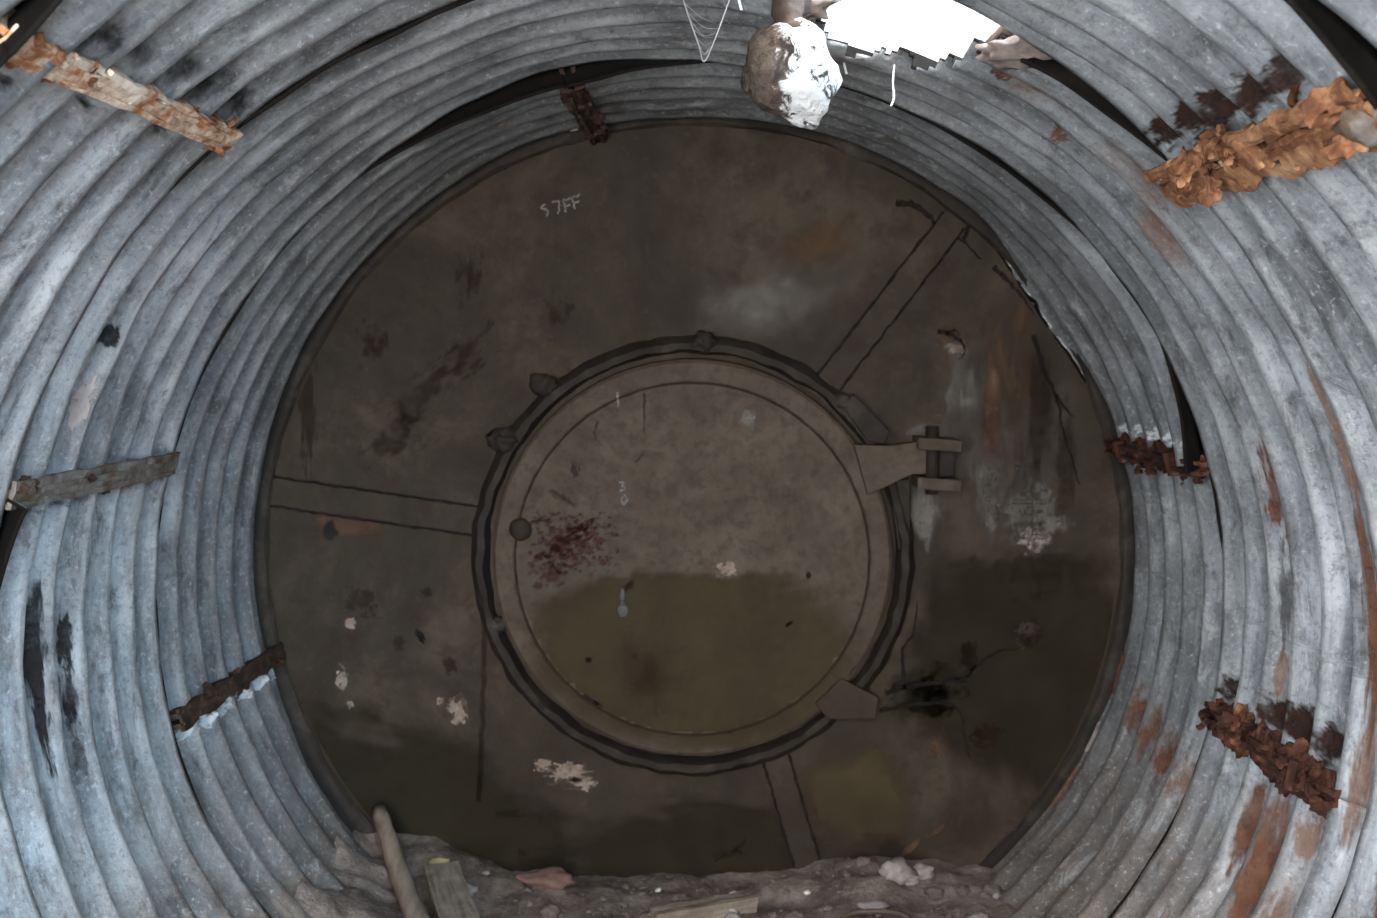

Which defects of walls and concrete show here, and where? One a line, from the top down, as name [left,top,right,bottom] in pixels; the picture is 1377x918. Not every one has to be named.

corrosion [33,31,67,85]
corrosion [87,55,101,89]
corrosion [193,105,237,159]
corrosion [1169,119,1245,207]
corrosion [1287,76,1369,160]
corrosion [1112,432,1208,486]
corrosion [528,496,619,589]
corrosion [1196,371,1377,918]
corrosion [1053,722,1100,803]